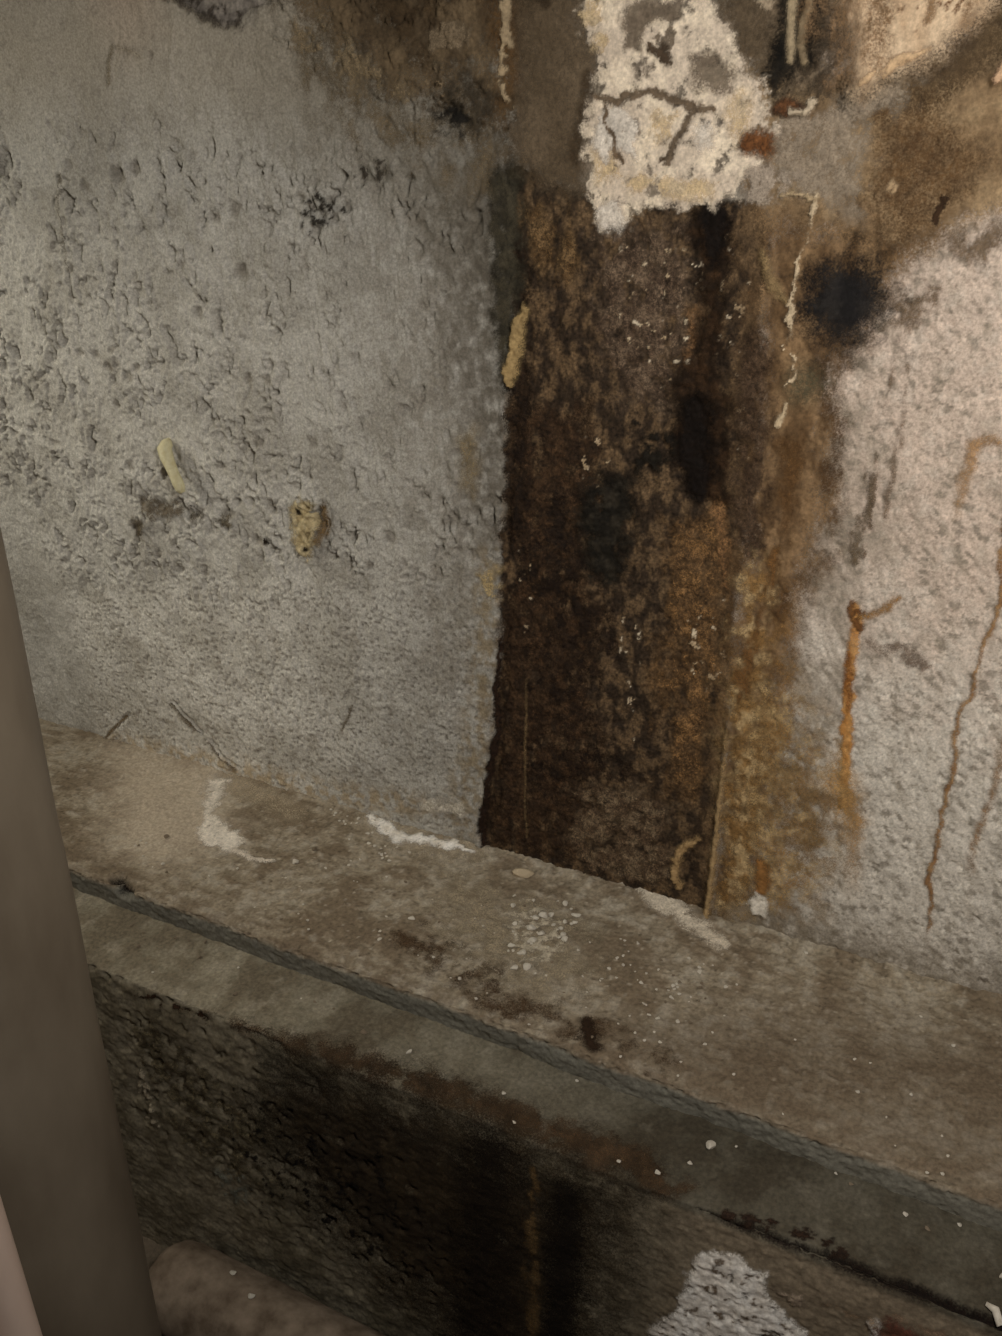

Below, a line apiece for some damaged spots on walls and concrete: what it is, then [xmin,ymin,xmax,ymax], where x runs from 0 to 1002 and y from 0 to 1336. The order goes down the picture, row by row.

crack [592,87,716,166]
flaking render [477,0,796,913]
leakage [573,0,1002,950]
corrosion [956,435,1002,505]
leakage [196,775,307,863]
leakage [419,797,466,818]
corrosion [712,547,901,916]
corrosion [924,548,1002,929]
leakage [240,1036,643,1336]